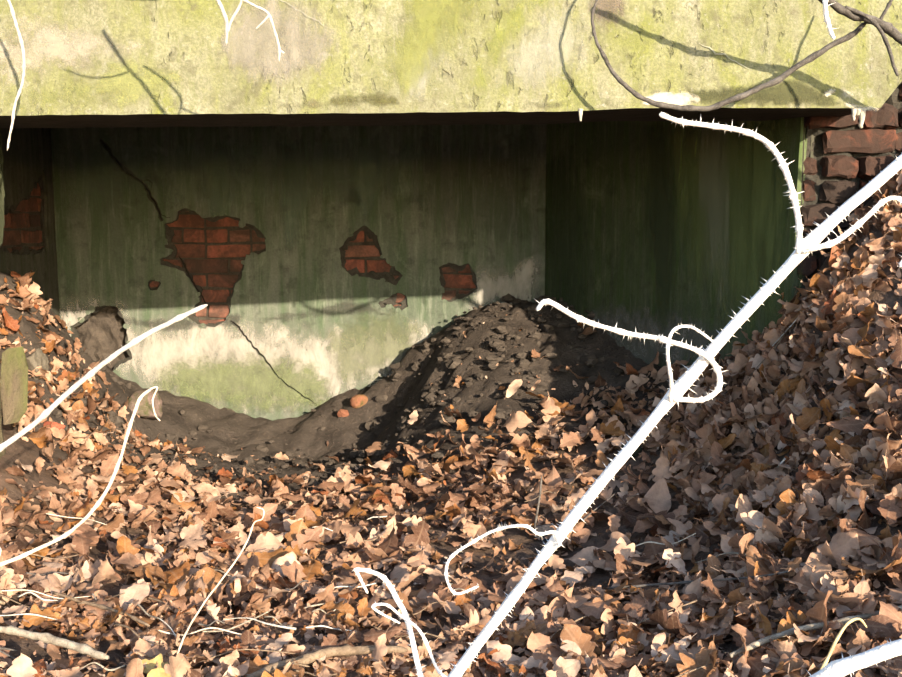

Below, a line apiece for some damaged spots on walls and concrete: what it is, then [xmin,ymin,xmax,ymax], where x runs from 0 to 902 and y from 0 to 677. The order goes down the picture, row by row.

crack [99,139,170,221]
leakage [60,300,97,337]
crack [179,256,210,309]
flaking render [160,208,266,329]
flaking render [339,225,408,313]
flaking render [437,263,478,303]
leakage [476,260,538,305]
crack [230,320,318,406]
leakage [119,323,432,410]